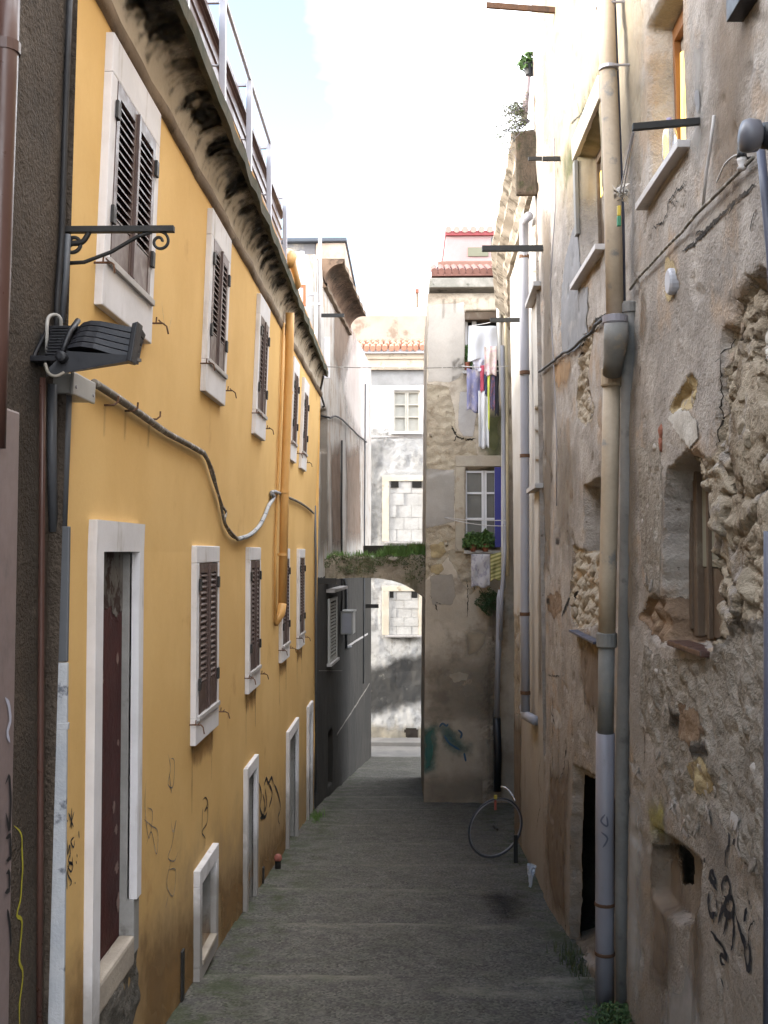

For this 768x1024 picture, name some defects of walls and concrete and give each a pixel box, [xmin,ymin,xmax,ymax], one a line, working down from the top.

crack [652,180,687,229]
crack [683,184,755,251]
spalling [576,320,600,427]
crack [715,336,736,446]
spalling [546,545,600,630]
spalling [637,274,768,925]
hole [581,774,596,917]